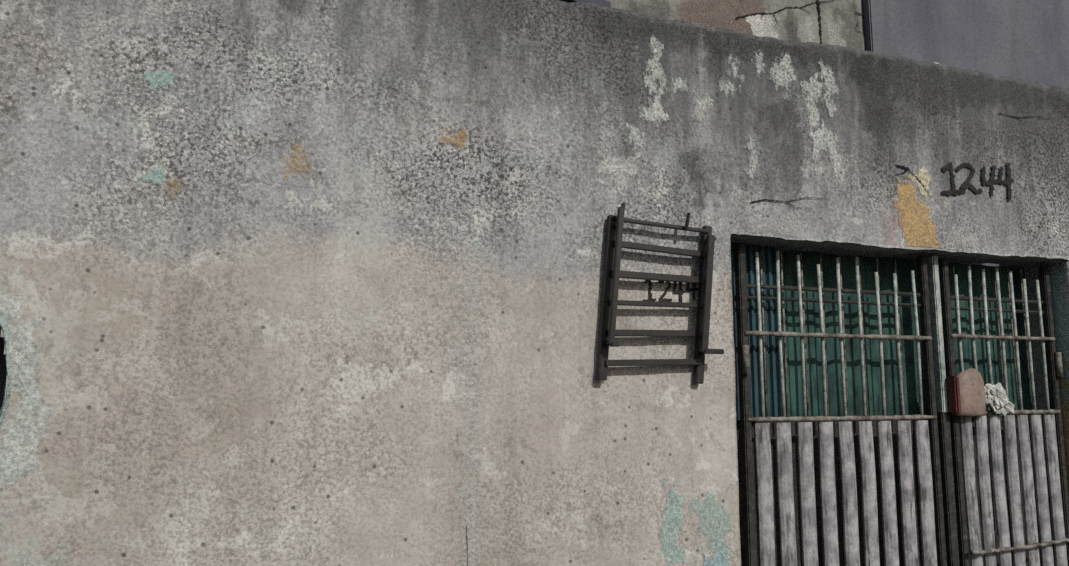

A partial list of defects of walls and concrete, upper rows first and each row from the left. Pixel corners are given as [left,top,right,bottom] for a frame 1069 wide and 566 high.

crack [736,0,865,44]
leakage [594,38,685,183]
leakage [696,56,743,118]
leakage [747,135,760,178]
leakage [751,53,843,176]
peeling [658,478,730,566]